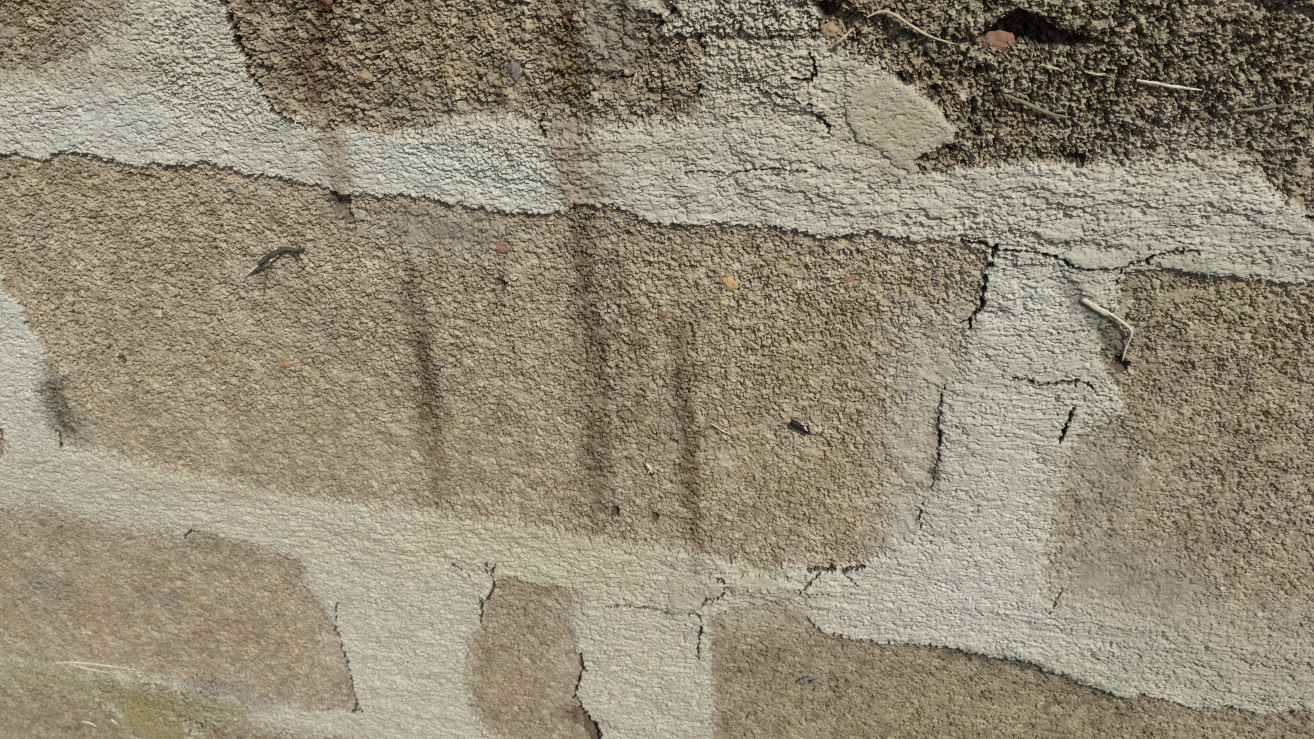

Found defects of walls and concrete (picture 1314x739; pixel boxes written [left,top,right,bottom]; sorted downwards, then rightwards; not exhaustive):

hole [816,0,841,20]
hole [982,7,1090,49]
peeling [845,71,956,183]
hole [330,190,355,222]
crack [959,238,1201,330]
spalling [1111,354,1131,372]
crack [1012,377,1098,444]
crack [917,384,946,530]
crack [451,562,496,623]
crack [605,578,736,660]
crack [786,564,866,601]
spalling [579,703,603,739]